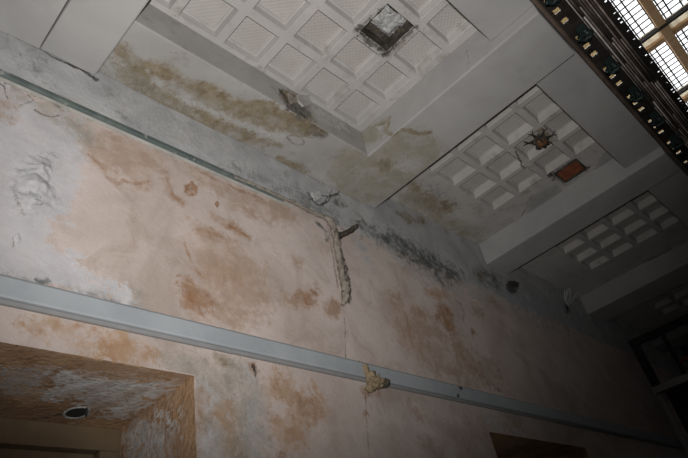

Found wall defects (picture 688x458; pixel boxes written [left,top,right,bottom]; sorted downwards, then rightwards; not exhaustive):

flaking render [355,3,418,57]
leakage [123,60,311,146]
flaking render [279,89,347,145]
leakage [277,121,468,235]
leakage [356,219,466,287]
peeling [38,365,184,458]